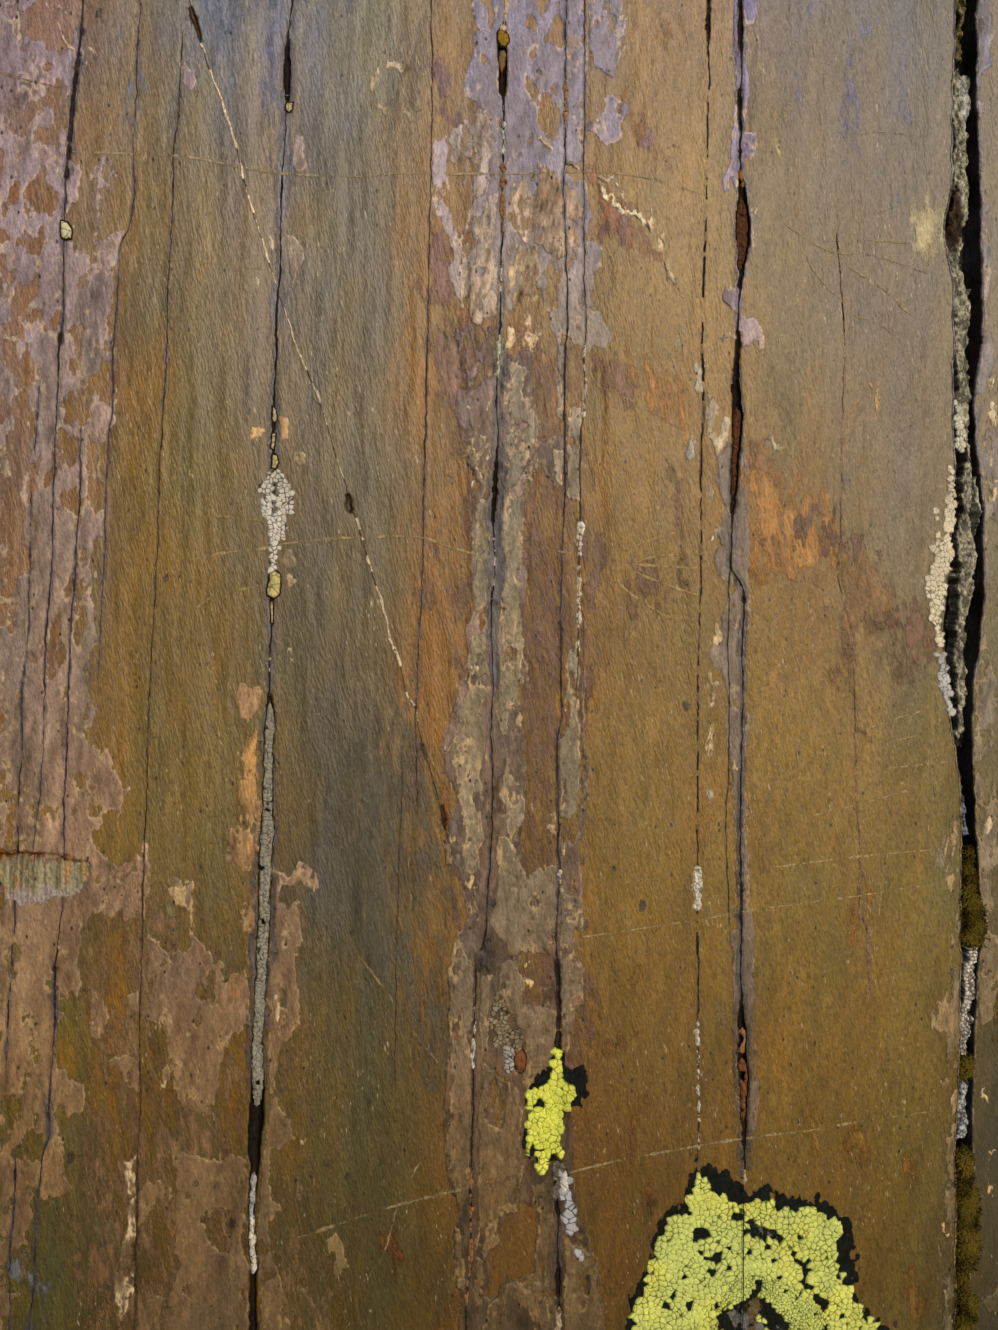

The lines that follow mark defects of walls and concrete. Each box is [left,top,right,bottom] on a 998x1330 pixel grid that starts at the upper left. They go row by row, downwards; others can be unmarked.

crack [5,900,17,1063]
spalling [0,848,90,907]
crack [8,0,142,1330]
crack [134,0,454,1330]
spalling [474,938,492,972]
crack [464,20,509,1330]
crack [549,1157,564,1330]
crack [554,0,587,1050]
crack [696,0,751,1330]
crack [941,0,987,1330]